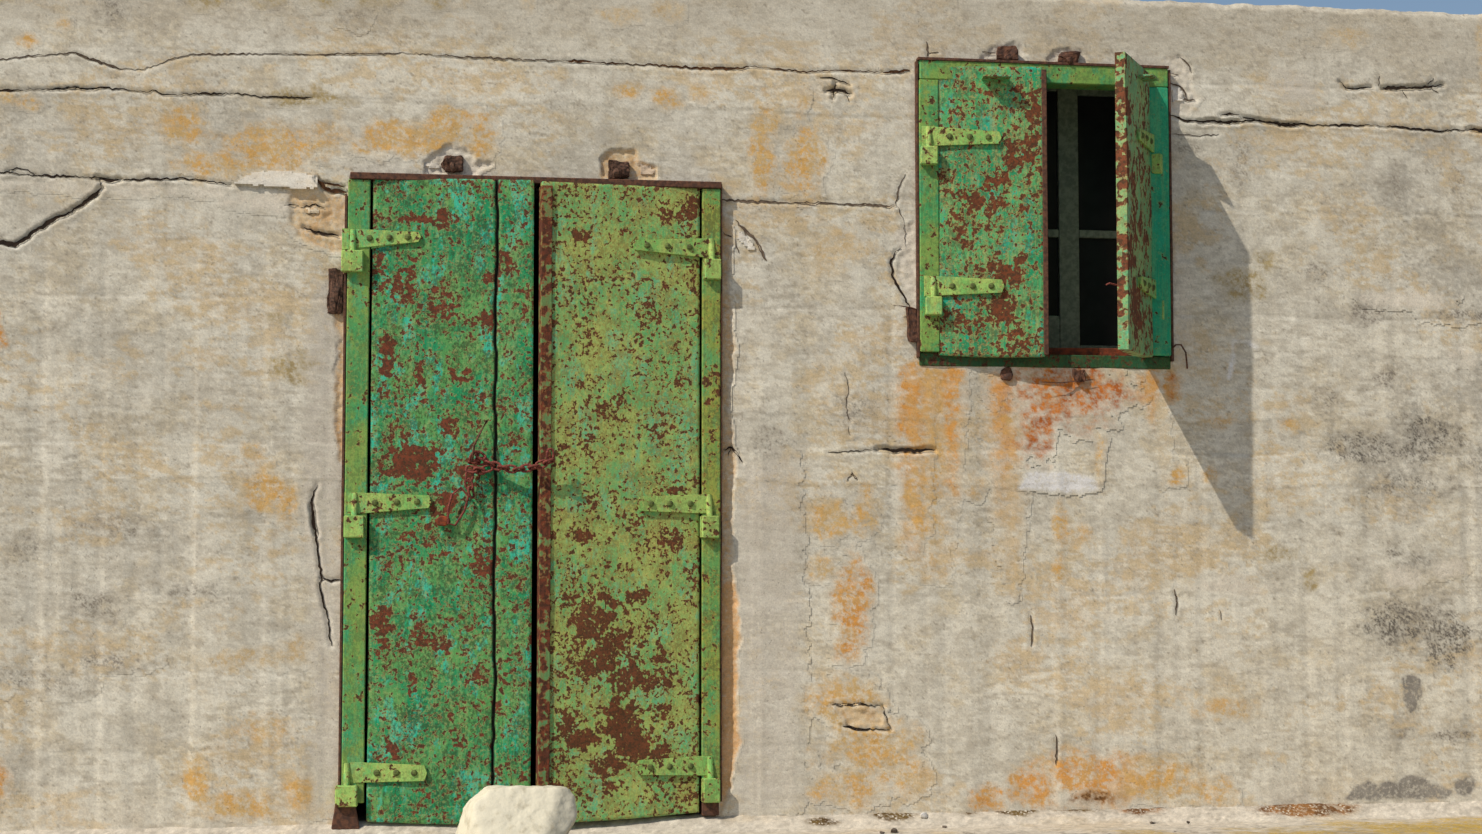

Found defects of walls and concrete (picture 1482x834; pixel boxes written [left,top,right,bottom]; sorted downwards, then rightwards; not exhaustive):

crack [0,41,936,101]
crack [1171,57,1482,137]
crack [0,167,227,247]
spalling [234,170,348,466]
corrosion [881,57,1183,587]
leakage [1163,461,1224,489]
leakage [1274,363,1482,516]
crack [310,487,340,646]
corrosion [825,541,879,669]
leakage [1330,586,1482,745]
corrosion [964,741,1138,812]
mould [1342,772,1479,804]